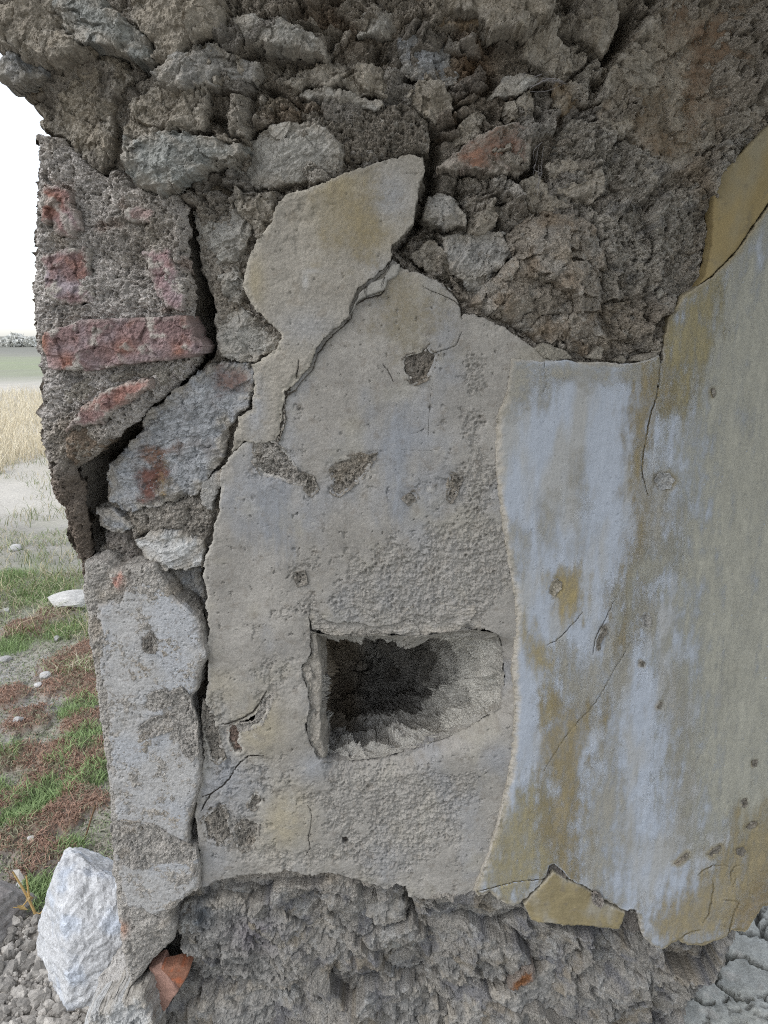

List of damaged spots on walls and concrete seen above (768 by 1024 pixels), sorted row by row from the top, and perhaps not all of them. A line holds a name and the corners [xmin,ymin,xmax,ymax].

spalling [548,119,763,363]
peeling [232,154,425,498]
crack [278,256,394,441]
spalling [402,343,439,386]
crack [108,430,142,461]
crack [641,356,662,491]
crack [66,526,77,552]
leakage [488,215,768,945]
crack [197,659,267,725]
crack [192,755,264,832]
peeling [523,864,640,933]